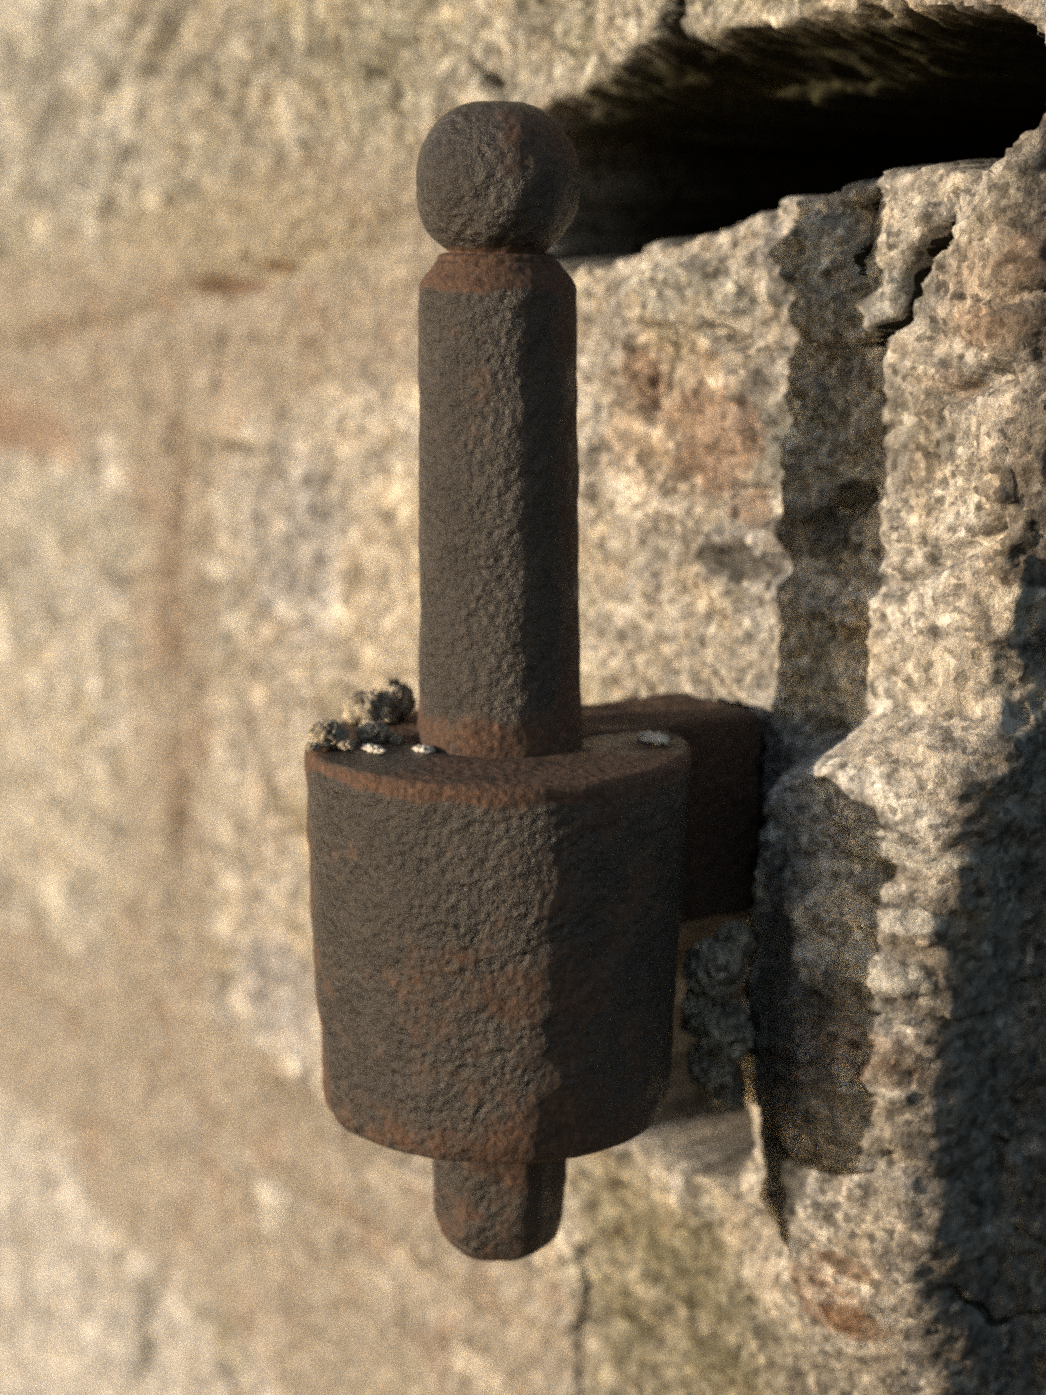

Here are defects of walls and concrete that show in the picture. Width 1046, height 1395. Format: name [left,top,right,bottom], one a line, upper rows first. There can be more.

crack [662,0,767,69]
spalling [544,0,1046,274]
crack [954,1286,1046,1327]